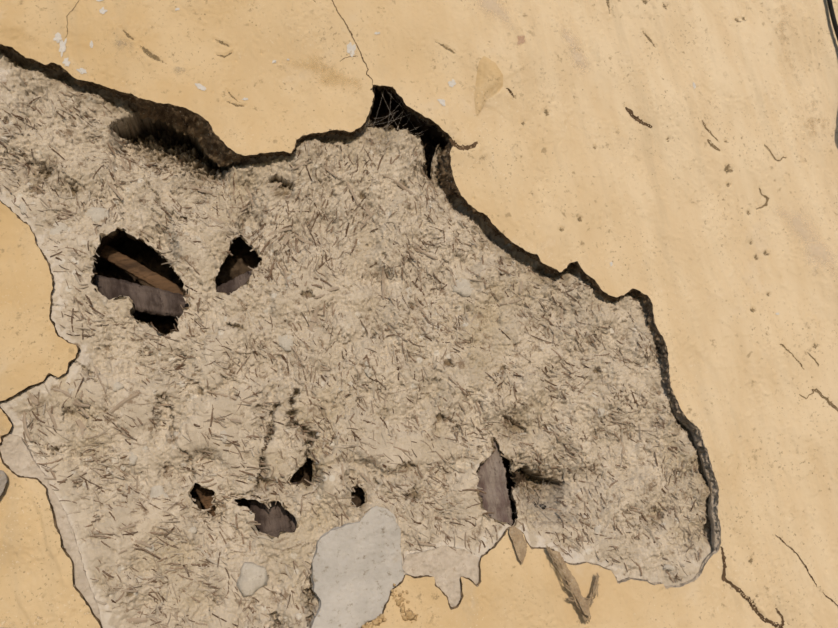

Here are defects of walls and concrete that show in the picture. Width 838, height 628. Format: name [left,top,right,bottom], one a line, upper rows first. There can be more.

peeling [53,32,70,67]
crack [332,0,373,85]
crack [780,344,819,369]
crack [799,388,838,411]
flaking render [508,525,527,564]
flaking render [546,545,600,624]
crack [720,547,785,628]
crack [777,536,838,606]